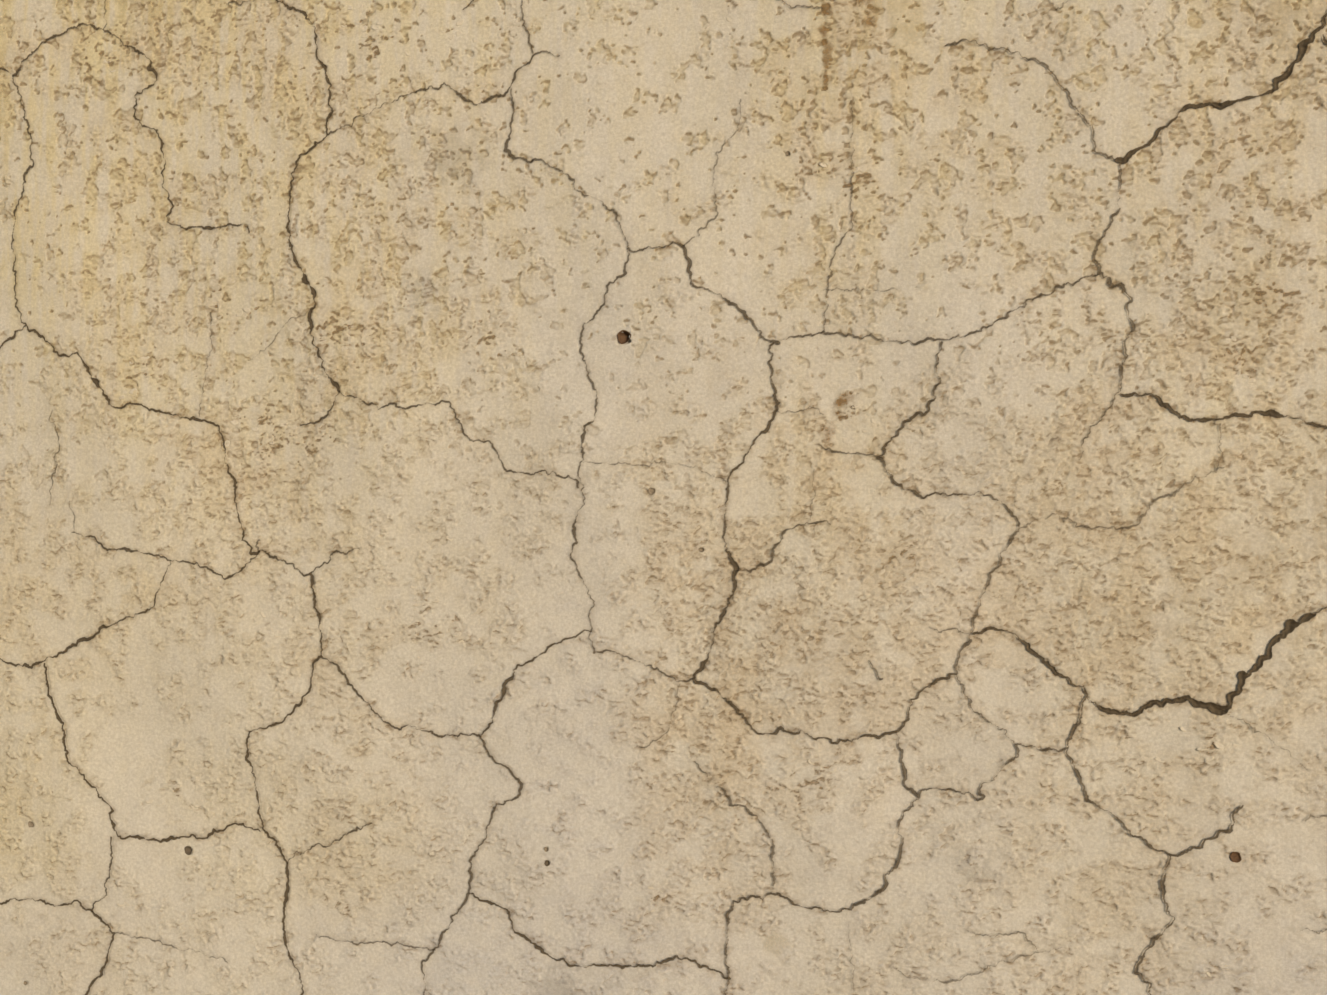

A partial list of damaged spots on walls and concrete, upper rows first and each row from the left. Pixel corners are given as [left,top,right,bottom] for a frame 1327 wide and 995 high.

crack [0,0,731,995]
crack [648,172,1327,995]
crack [945,13,1327,192]